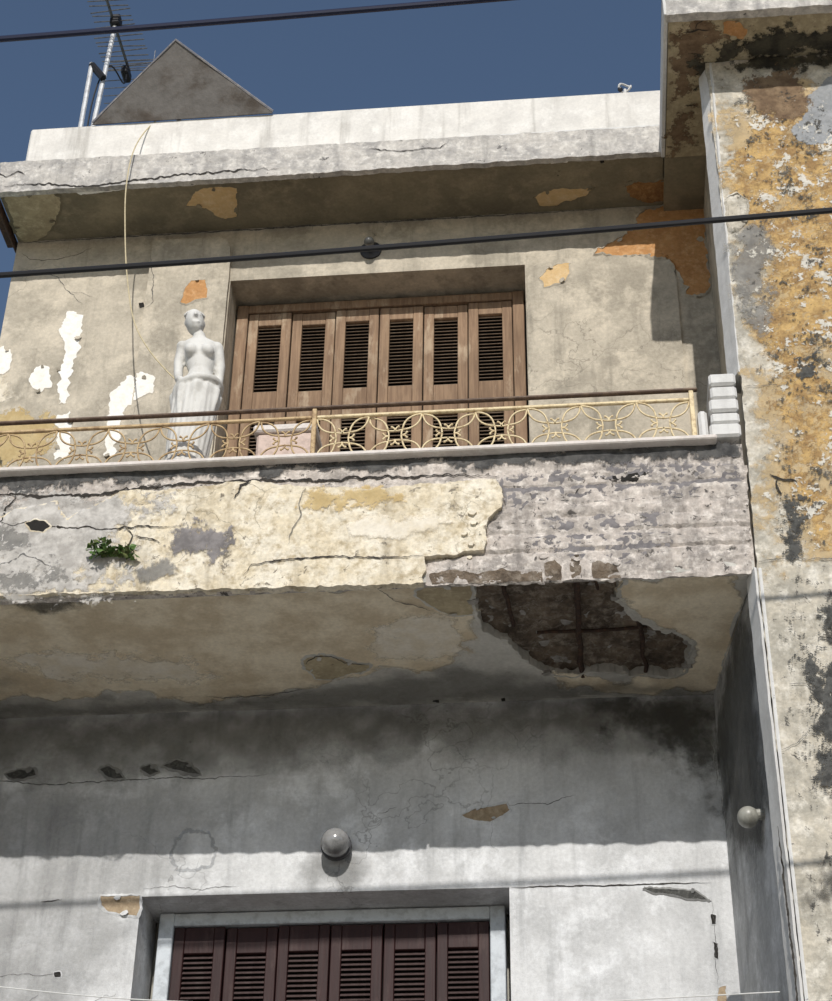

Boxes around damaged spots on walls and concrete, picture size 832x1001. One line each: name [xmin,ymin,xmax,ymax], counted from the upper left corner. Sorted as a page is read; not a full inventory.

peeling [182,184,240,221]
peeling [0,345,14,375]
peeling [28,310,85,462]
flaking render [413,77,832,679]
damp [686,17,832,808]
crack [0,473,496,574]
damp [0,376,744,705]
damp [553,575,766,849]
flaking render [458,801,512,825]
flaking render [97,893,143,919]
crack [512,881,699,889]
damp [803,844,832,916]